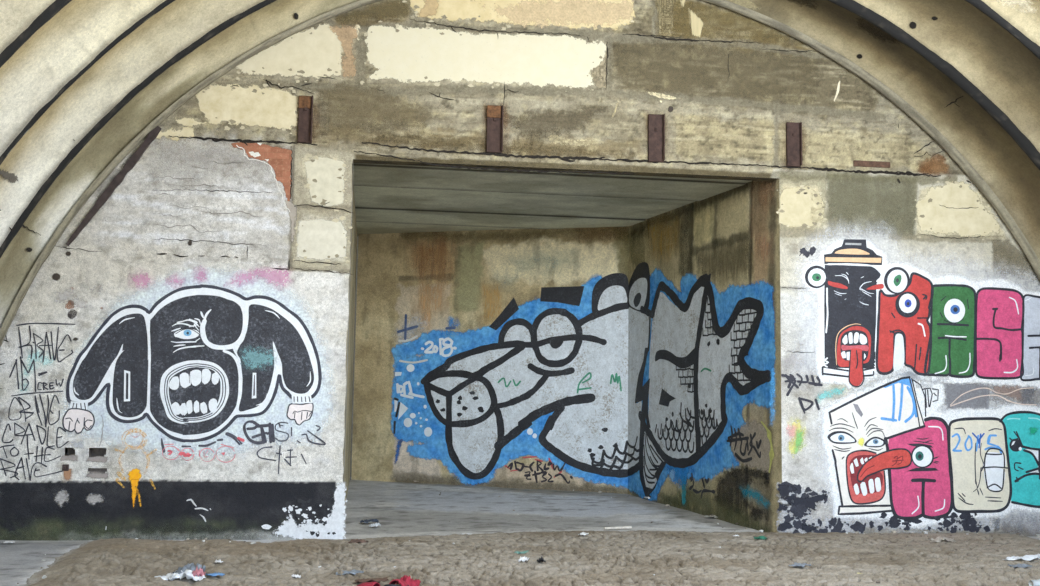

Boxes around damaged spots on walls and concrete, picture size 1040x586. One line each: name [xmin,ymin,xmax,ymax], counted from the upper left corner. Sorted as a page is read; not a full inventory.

peeling [156,0,636,141]
rust [298,96,311,109]
rust [487,105,501,118]
crack [354,141,942,183]
peeling [231,142,352,266]